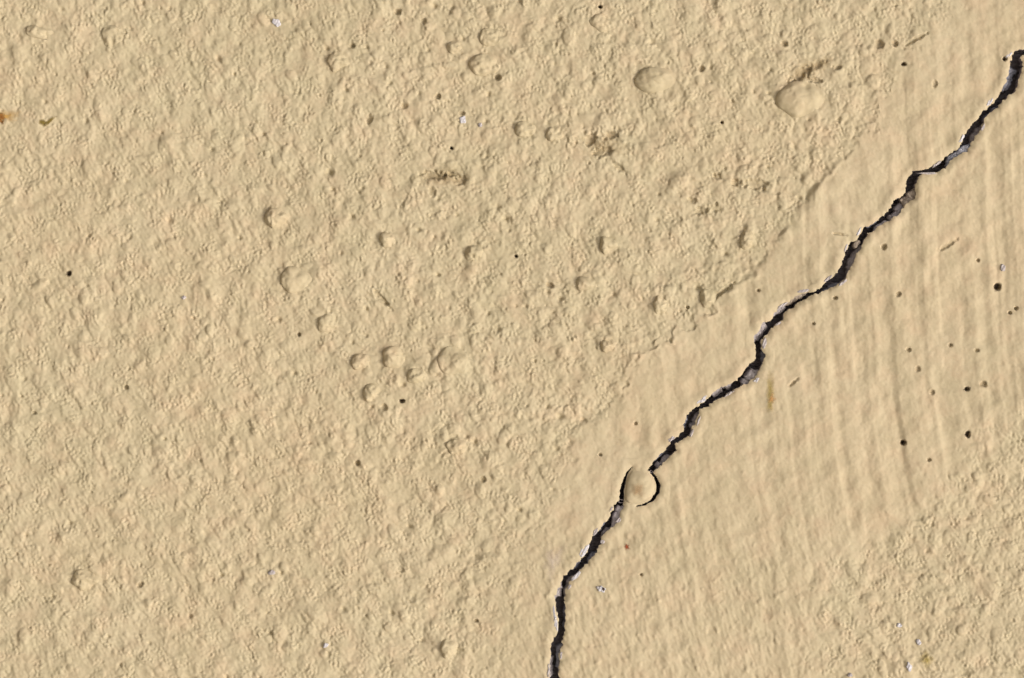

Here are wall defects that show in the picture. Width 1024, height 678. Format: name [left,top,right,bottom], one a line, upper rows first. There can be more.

crack [547,49,1024,678]